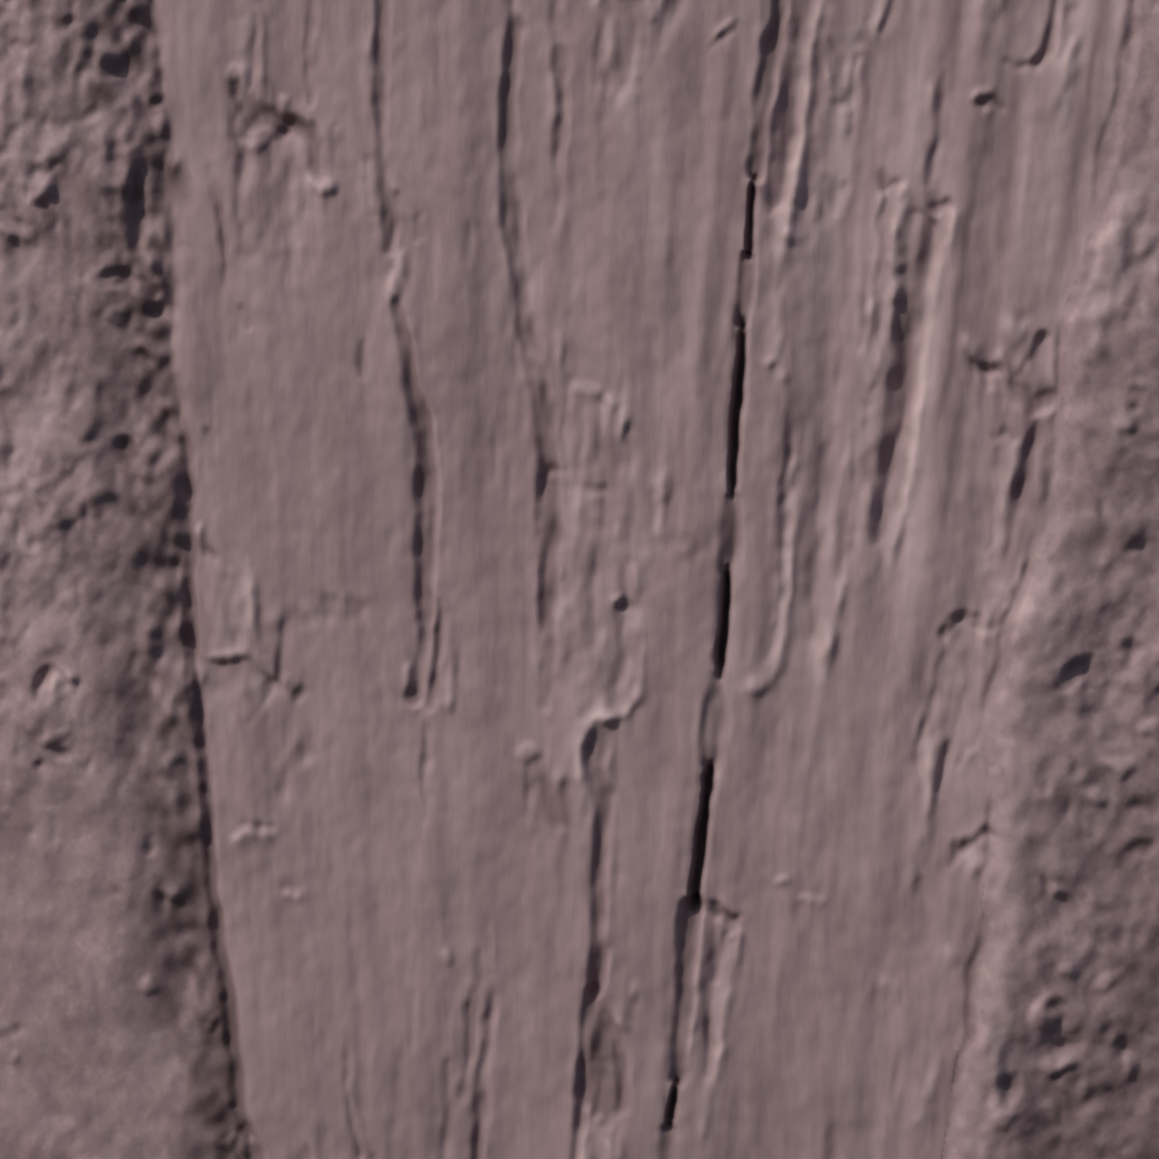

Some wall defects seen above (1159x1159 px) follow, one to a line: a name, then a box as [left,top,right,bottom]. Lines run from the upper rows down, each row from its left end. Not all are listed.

crack [649,0,685,53]
crack [659,0,789,1159]